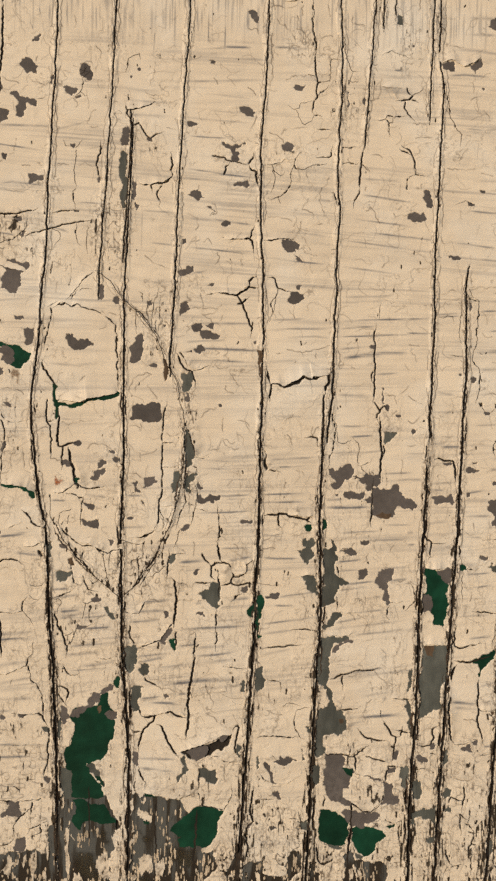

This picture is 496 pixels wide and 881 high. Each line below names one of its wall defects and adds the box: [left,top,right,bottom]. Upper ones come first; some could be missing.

peeling [0,84,37,123]
crack [260,93,314,136]
peeling [408,190,442,223]
peeling [1,259,30,293]
peeling [187,323,221,354]
peeling [329,464,417,519]
crack [198,248,496,881]
peeling [124,645,150,712]
peeling [256,538,452,829]
peeling [60,684,119,747]
peeling [177,735,242,784]
peeling [1,837,51,881]